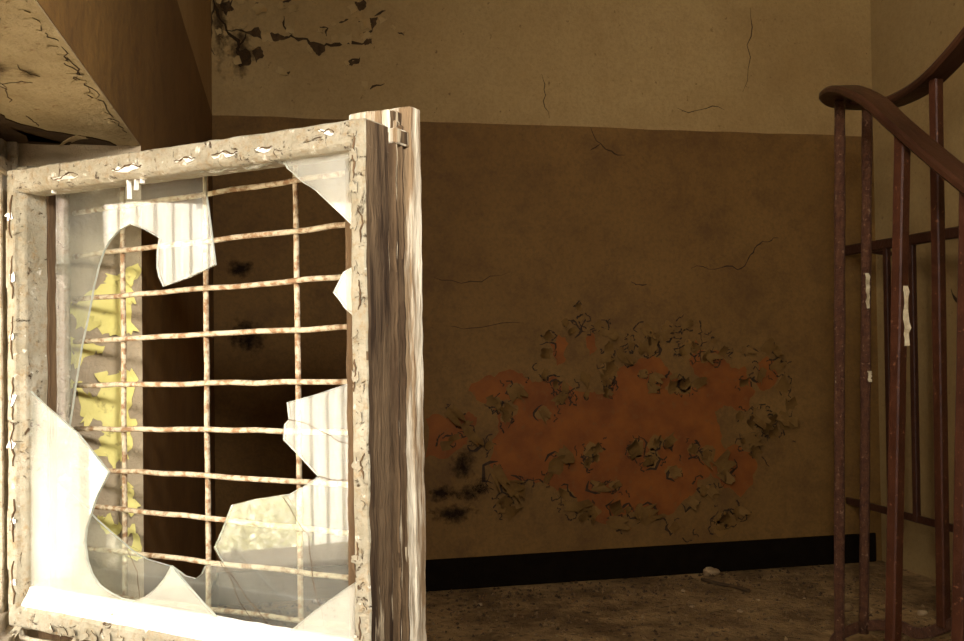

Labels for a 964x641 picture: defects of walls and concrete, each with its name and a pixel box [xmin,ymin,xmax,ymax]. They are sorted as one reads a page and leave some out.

peeling [211,0,404,67]
crack [0,64,40,126]
crack [41,27,127,133]